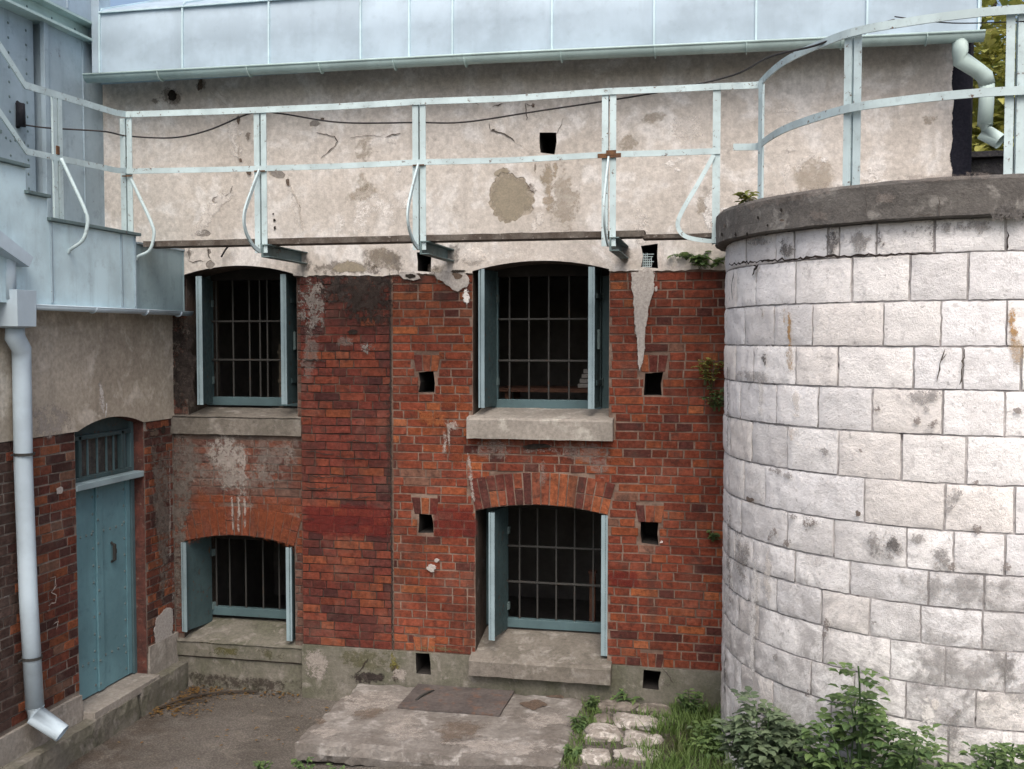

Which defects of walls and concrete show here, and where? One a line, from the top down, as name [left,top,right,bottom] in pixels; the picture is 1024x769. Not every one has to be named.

crack [316,132,400,158]
crack [476,103,535,154]
peeling [491,168,536,223]
damp [531,163,558,231]
peeling [434,270,470,303]
crack [722,253,939,292]
corrosion [1008,310,1024,365]
crack [937,349,965,385]
peeling [154,572,174,643]